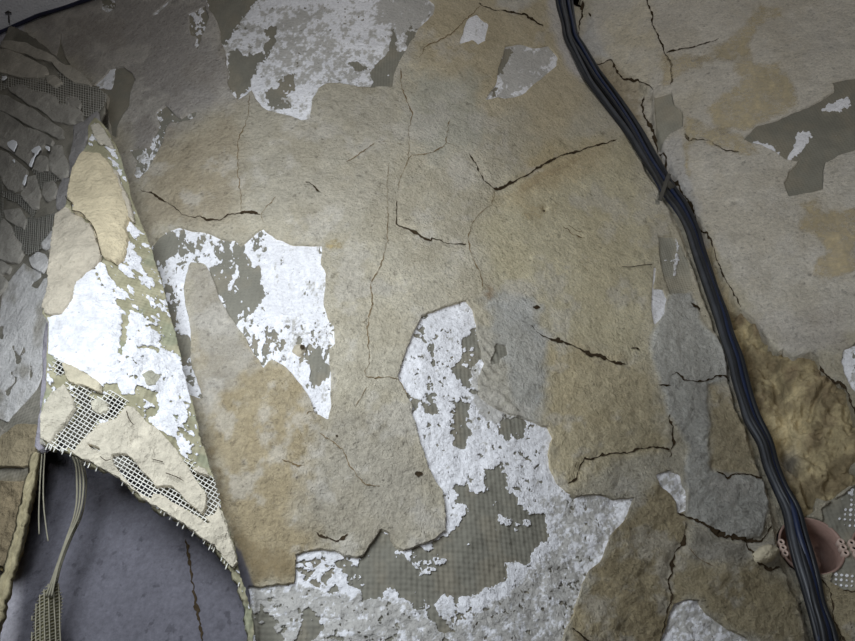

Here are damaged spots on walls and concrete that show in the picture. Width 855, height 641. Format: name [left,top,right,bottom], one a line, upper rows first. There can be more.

peeling [189,0,435,120]
peeling [460,15,488,44]
crack [420,3,543,56]
crack [578,1,591,34]
crack [141,96,275,221]
crack [597,0,741,307]
peeling [744,79,855,196]
crack [348,71,617,407]
flaking render [0,26,633,641]
crack [532,326,640,365]
crack [658,372,729,387]
crack [568,415,676,484]